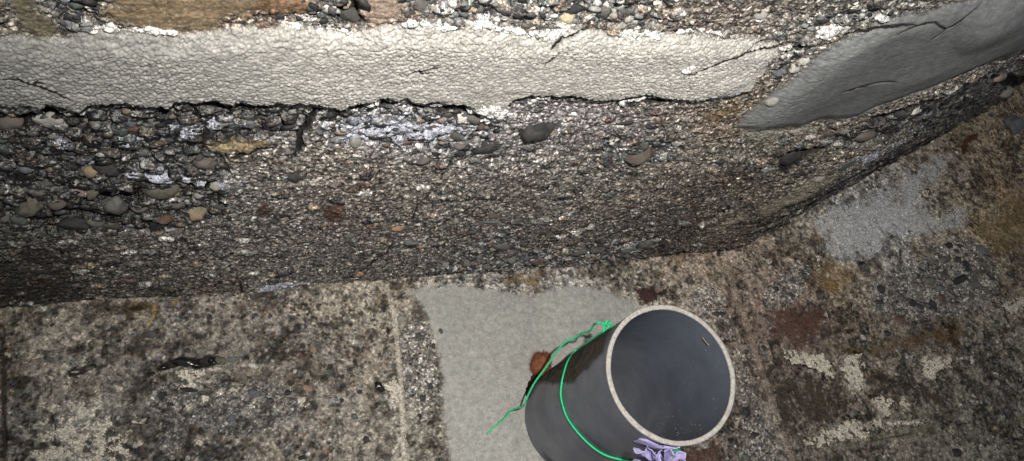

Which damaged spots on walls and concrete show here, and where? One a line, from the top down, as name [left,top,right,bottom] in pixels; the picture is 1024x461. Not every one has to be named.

crack [837,2,983,41]
crack [544,28,588,66]
crack [683,39,796,78]
crack [4,79,72,101]
flaking render [0,110,65,153]
efflorescence [336,105,510,146]
flaking render [437,113,502,158]
flaking render [519,122,555,142]
flaking render [613,121,658,130]
flaking render [286,162,306,183]
flaking render [0,162,128,230]
flaking render [174,181,226,221]